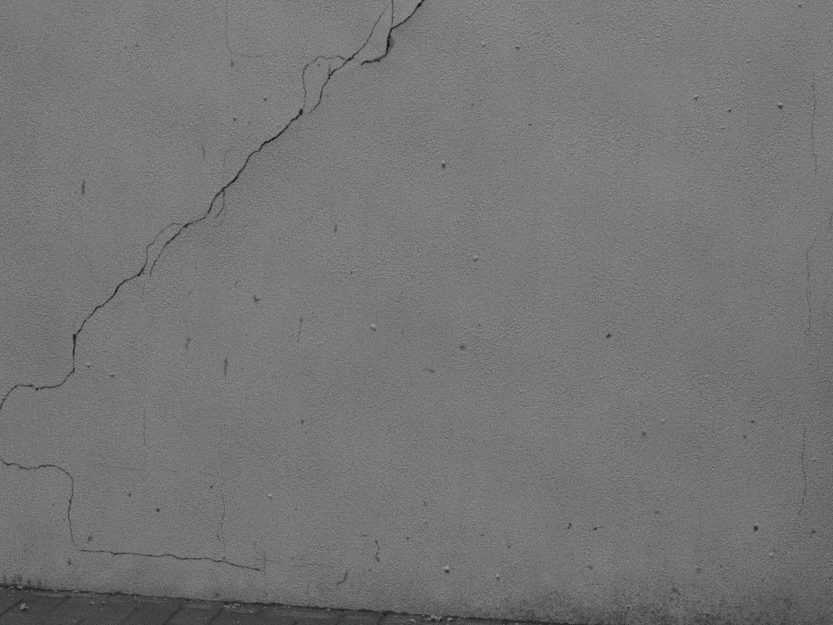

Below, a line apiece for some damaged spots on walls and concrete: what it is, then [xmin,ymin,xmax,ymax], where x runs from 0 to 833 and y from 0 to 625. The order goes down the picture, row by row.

crack [0,0,424,409]
crack [1,459,262,571]